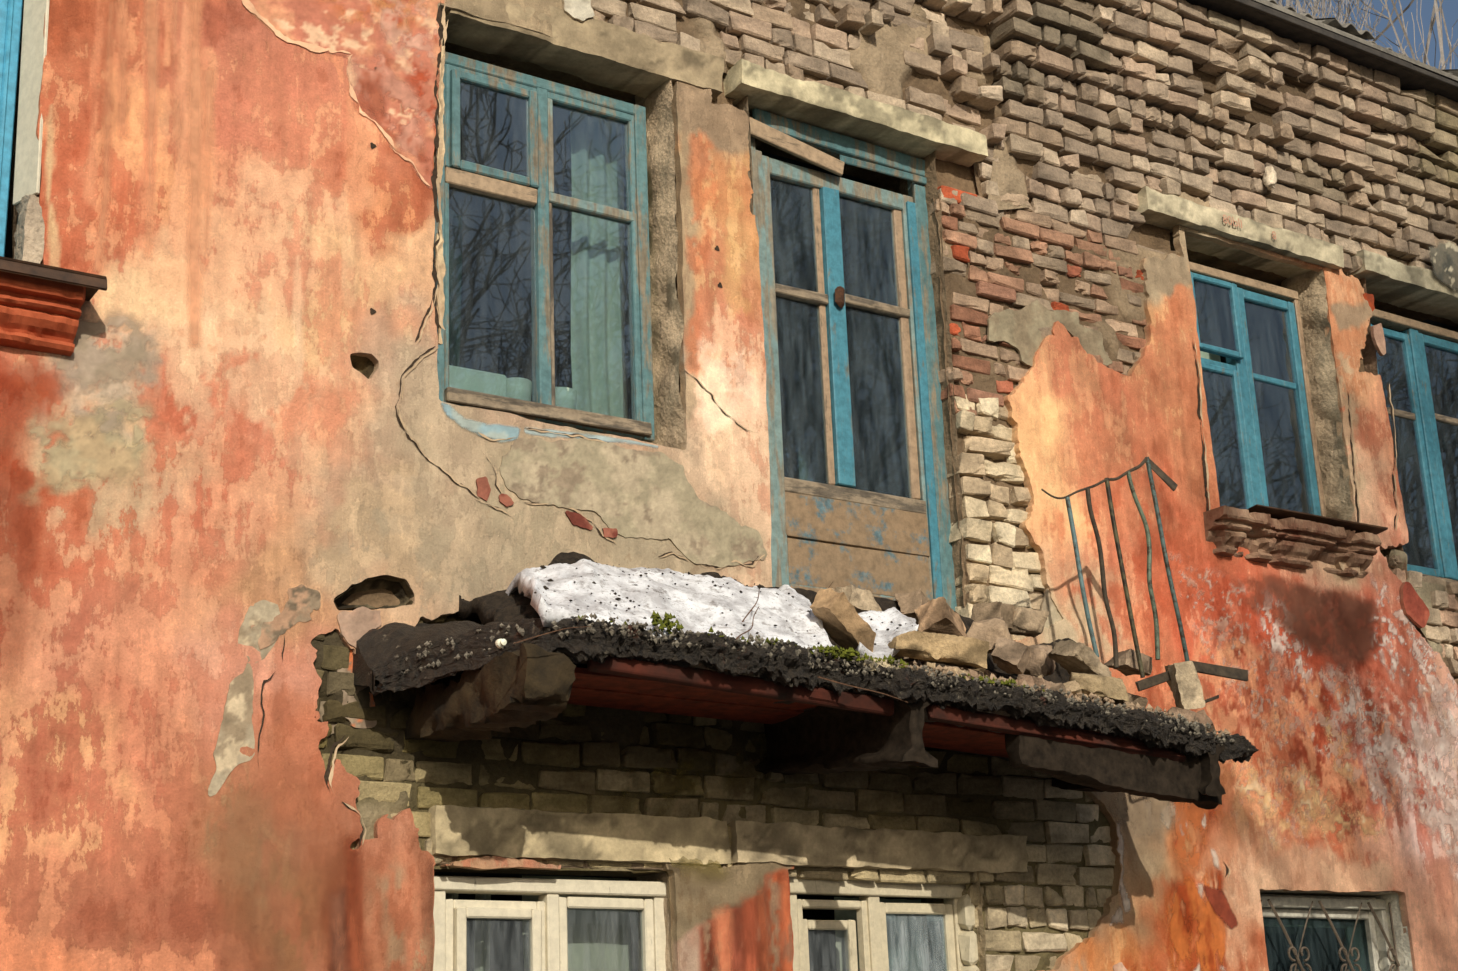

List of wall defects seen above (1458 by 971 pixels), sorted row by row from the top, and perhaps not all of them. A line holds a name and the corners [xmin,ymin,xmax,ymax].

peeling [242,0,446,189]
spalling [350,354,374,379]
flaking render [435,212,446,345]
crack [395,0,617,544]
spalling [562,0,1458,710]
spalling [208,577,1116,971]
water stain [1182,571,1458,878]